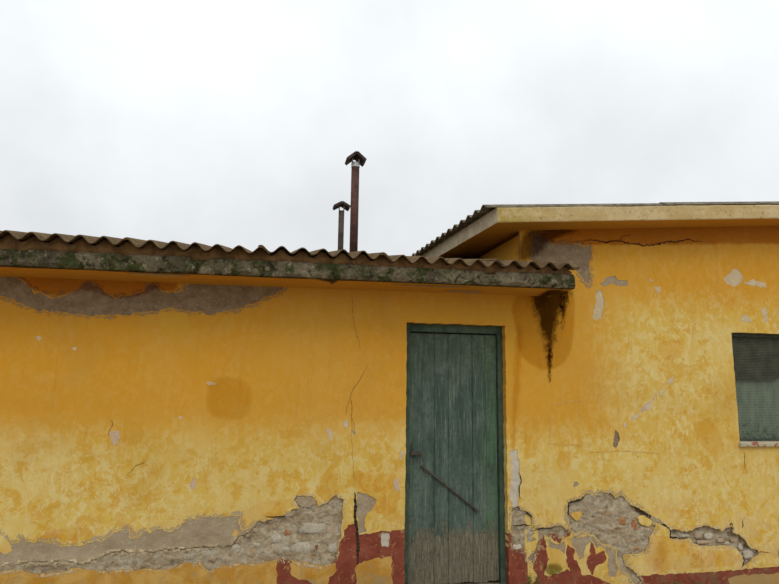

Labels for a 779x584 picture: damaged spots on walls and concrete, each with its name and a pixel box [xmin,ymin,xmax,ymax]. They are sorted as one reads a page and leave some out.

peeling [0,273,288,319]
leakage [533,290,568,380]
peeling [526,231,628,321]
crack [581,234,703,247]
peeling [724,268,767,288]
crack [344,366,367,565]
spalling [0,493,346,577]
peeling [356,491,377,533]
spalling [381,532,390,547]
spalling [508,449,779,584]